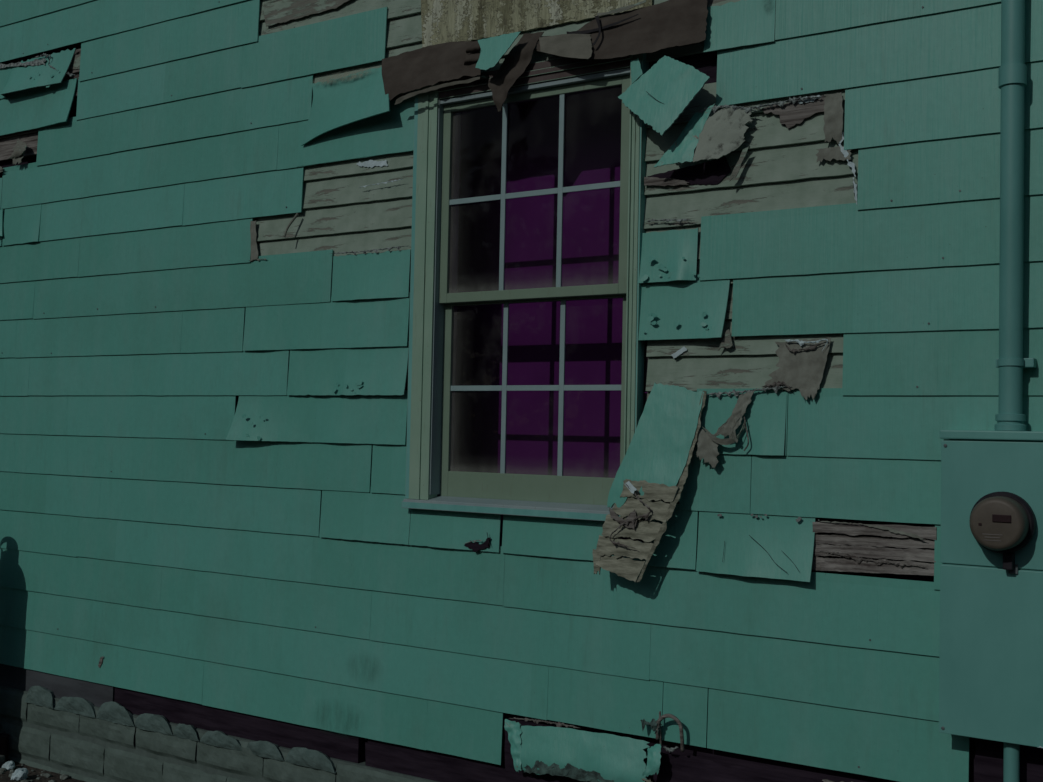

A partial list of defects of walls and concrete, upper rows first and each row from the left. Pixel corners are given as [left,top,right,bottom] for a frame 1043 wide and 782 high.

peeling [258,0,422,83]
peeling [481,18,596,72]
peeling [630,41,713,84]
peeling [0,128,39,173]
peeling [249,151,413,261]
peeling [643,82,858,275]
peeling [646,279,844,400]